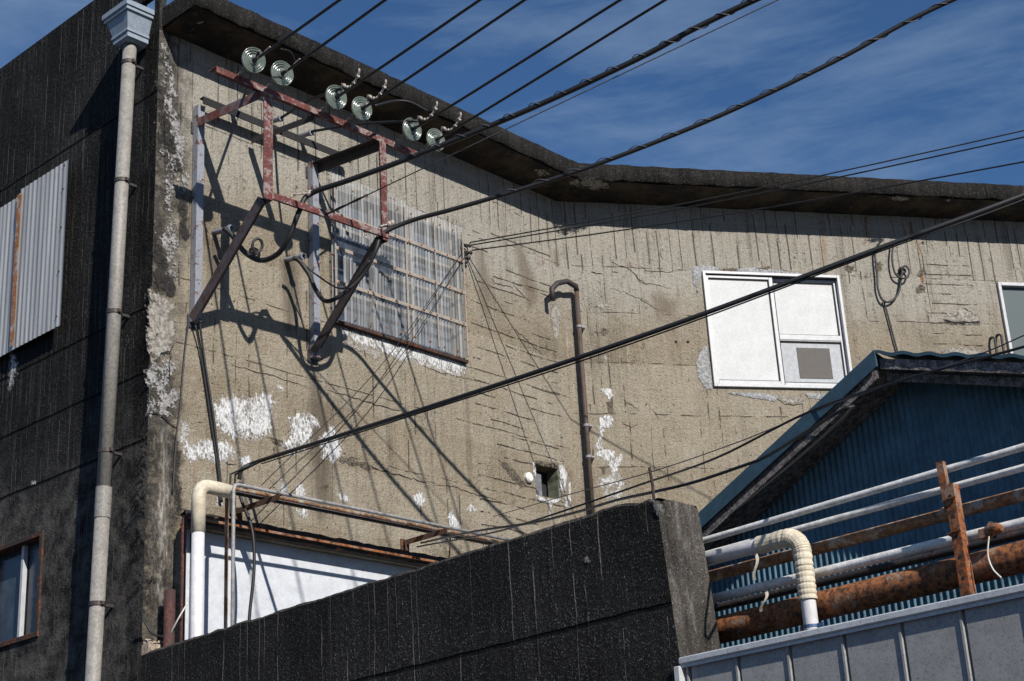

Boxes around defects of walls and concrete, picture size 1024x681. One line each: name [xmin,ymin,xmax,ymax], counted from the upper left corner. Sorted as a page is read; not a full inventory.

rust [9,192,22,347]
spalling [134,43,283,629]
peeling [340,327,467,375]
peeling [283,413,342,463]
flaking render [499,460,571,522]
peeling [595,388,624,503]